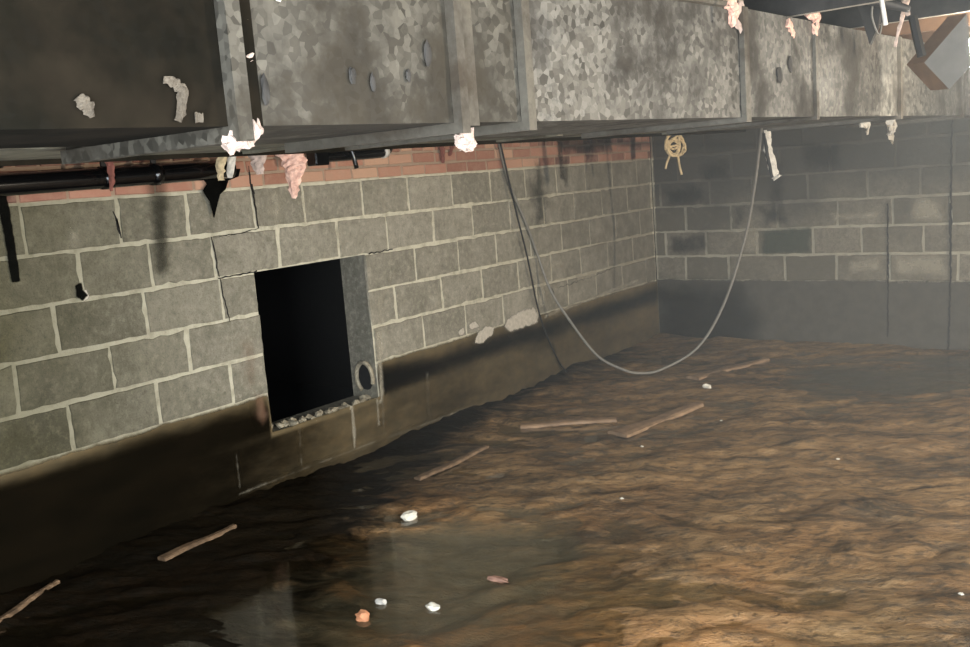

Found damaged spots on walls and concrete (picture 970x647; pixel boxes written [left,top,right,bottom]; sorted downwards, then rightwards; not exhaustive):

crack [211,166,259,322]
water stain [0,279,970,594]